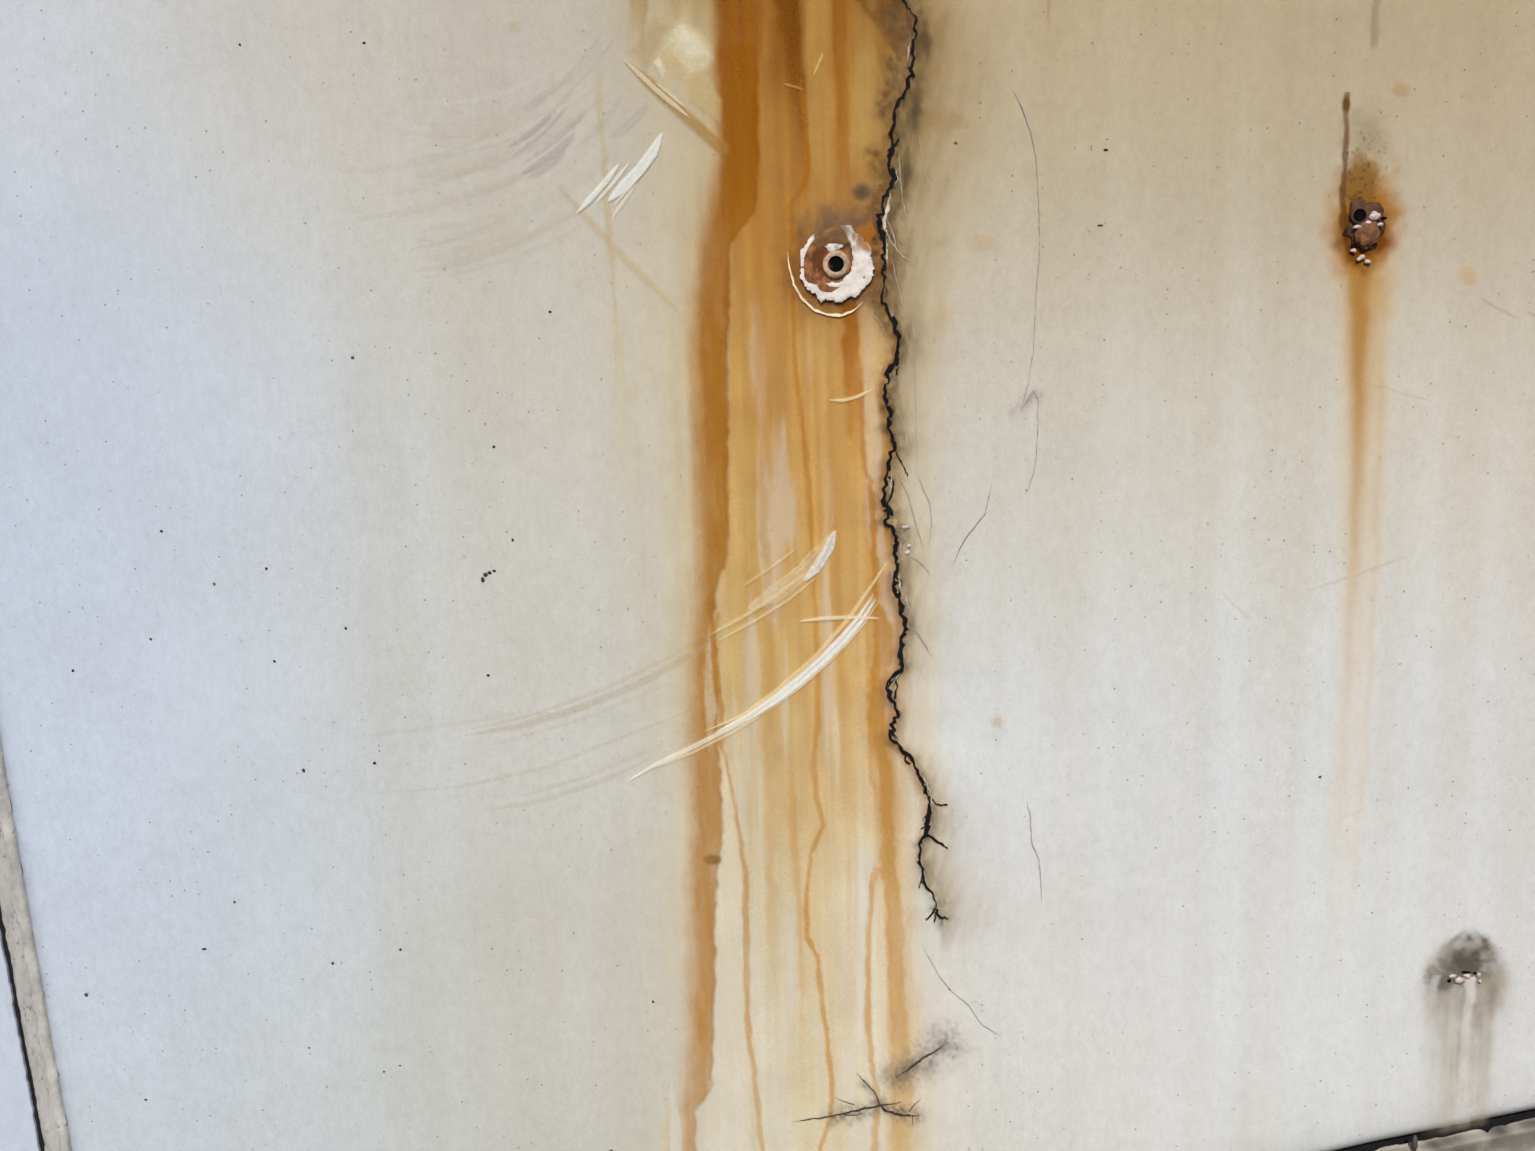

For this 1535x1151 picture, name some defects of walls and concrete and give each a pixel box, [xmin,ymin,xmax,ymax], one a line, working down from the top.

rust [680,0,918,1151]
crack [796,1038,950,1124]
crack [867,0,1042,1036]
rust [1336,97,1399,472]